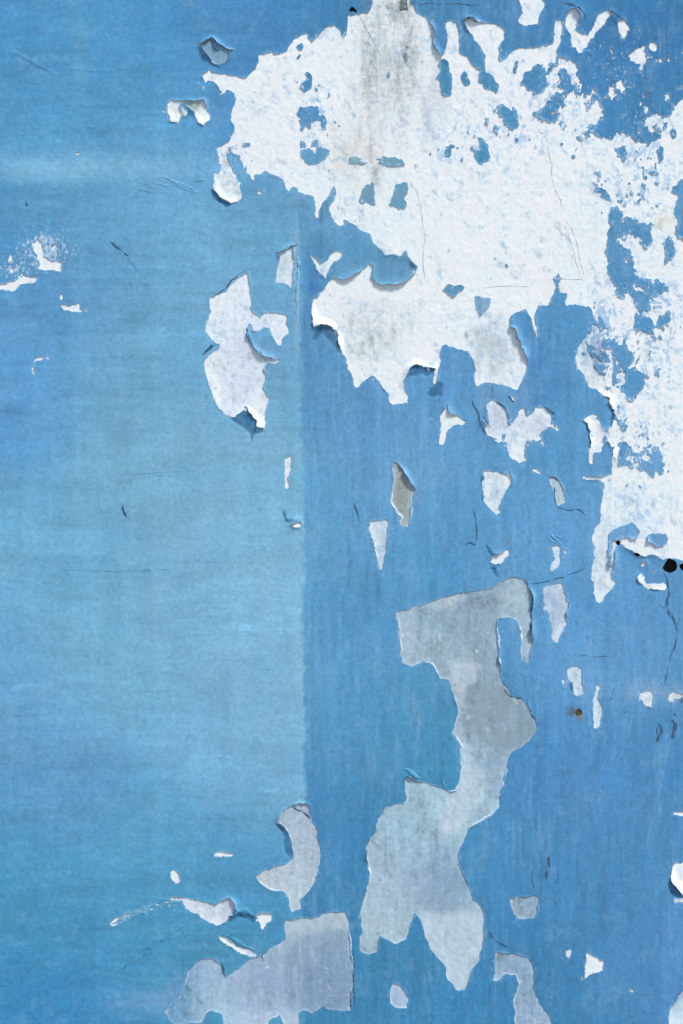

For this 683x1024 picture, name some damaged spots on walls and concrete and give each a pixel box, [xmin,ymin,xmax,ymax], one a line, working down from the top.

peeling [0,237,62,291]
peeling [163,0,683,603]
peeling [150,545,569,1024]